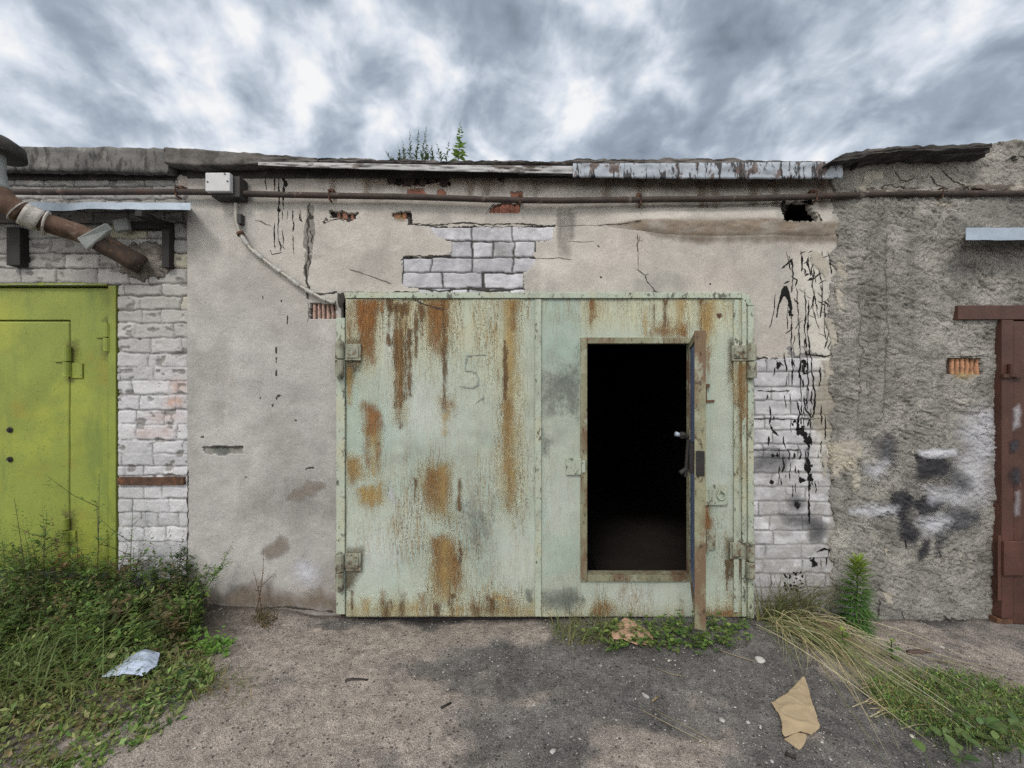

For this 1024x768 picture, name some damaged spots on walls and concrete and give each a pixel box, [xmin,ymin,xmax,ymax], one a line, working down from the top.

flaking render [307,292,345,322]
crack [303,203,418,299]
flaking render [393,192,556,292]
crack [637,234,657,292]
spalling [779,200,814,222]
rust [350,403,381,502]
rust [347,299,449,429]
rust [502,300,518,510]
damp [766,251,836,524]
flaking render [754,252,863,617]
damp [914,490,978,560]
rust [381,539,462,617]